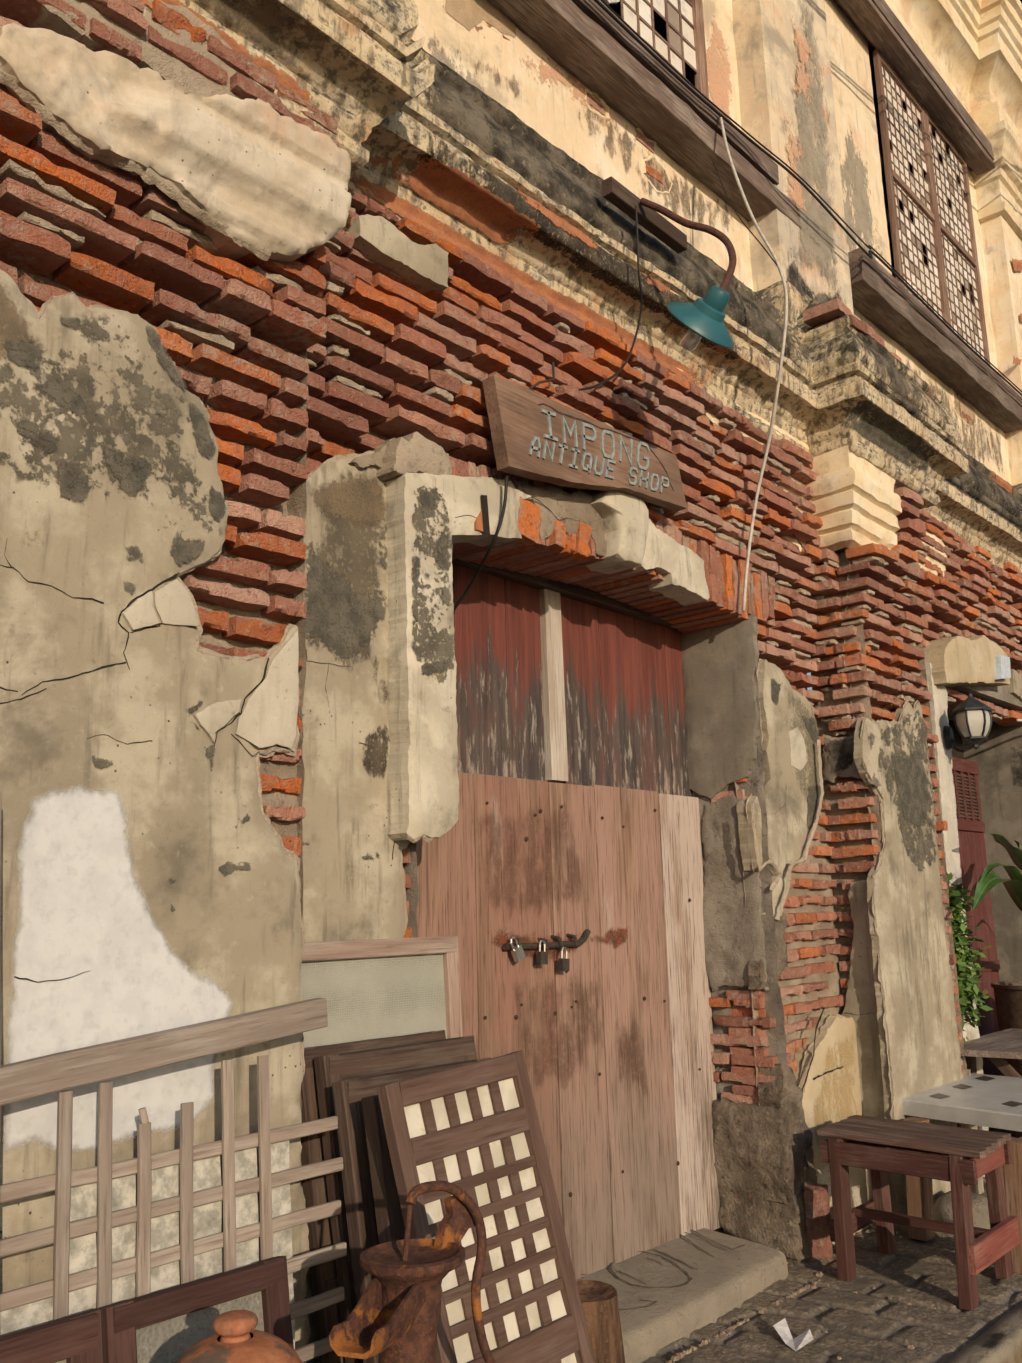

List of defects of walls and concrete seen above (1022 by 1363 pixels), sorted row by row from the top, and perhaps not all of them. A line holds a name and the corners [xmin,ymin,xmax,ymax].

peeling [141,0,339,115]
peeling [350,147,704,386]
leakage [410,39,802,369]
leakage [789,1,1022,531]
crack [0,541,198,704]
leakage [0,285,226,565]
spalling [121,325,309,856]
crack [214,658,269,756]
spalling [348,438,396,469]
leakage [412,486,455,682]
leakage [805,445,902,551]
spalling [402,834,444,938]